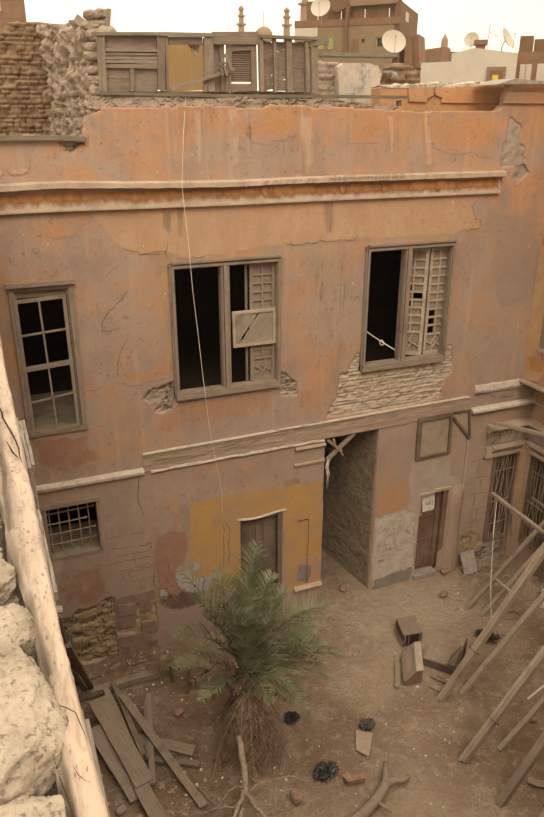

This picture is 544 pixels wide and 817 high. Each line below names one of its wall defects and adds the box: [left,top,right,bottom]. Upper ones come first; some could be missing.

spalling [143,381,174,414]
spalling [327,345,452,417]
spalling [19,527,191,666]